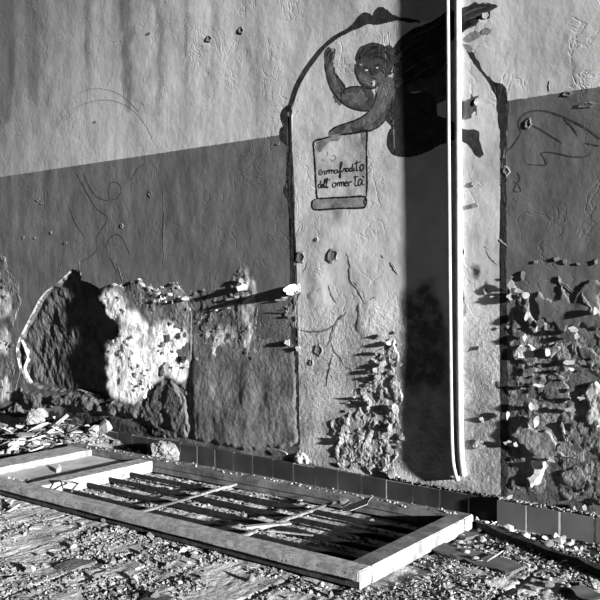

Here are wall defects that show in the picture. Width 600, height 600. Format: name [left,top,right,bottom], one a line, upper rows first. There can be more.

spalling [0,254,261,438]
peeling [275,284,301,328]
crack [300,285,357,402]
spalling [330,331,405,480]
peeling [503,276,600,510]